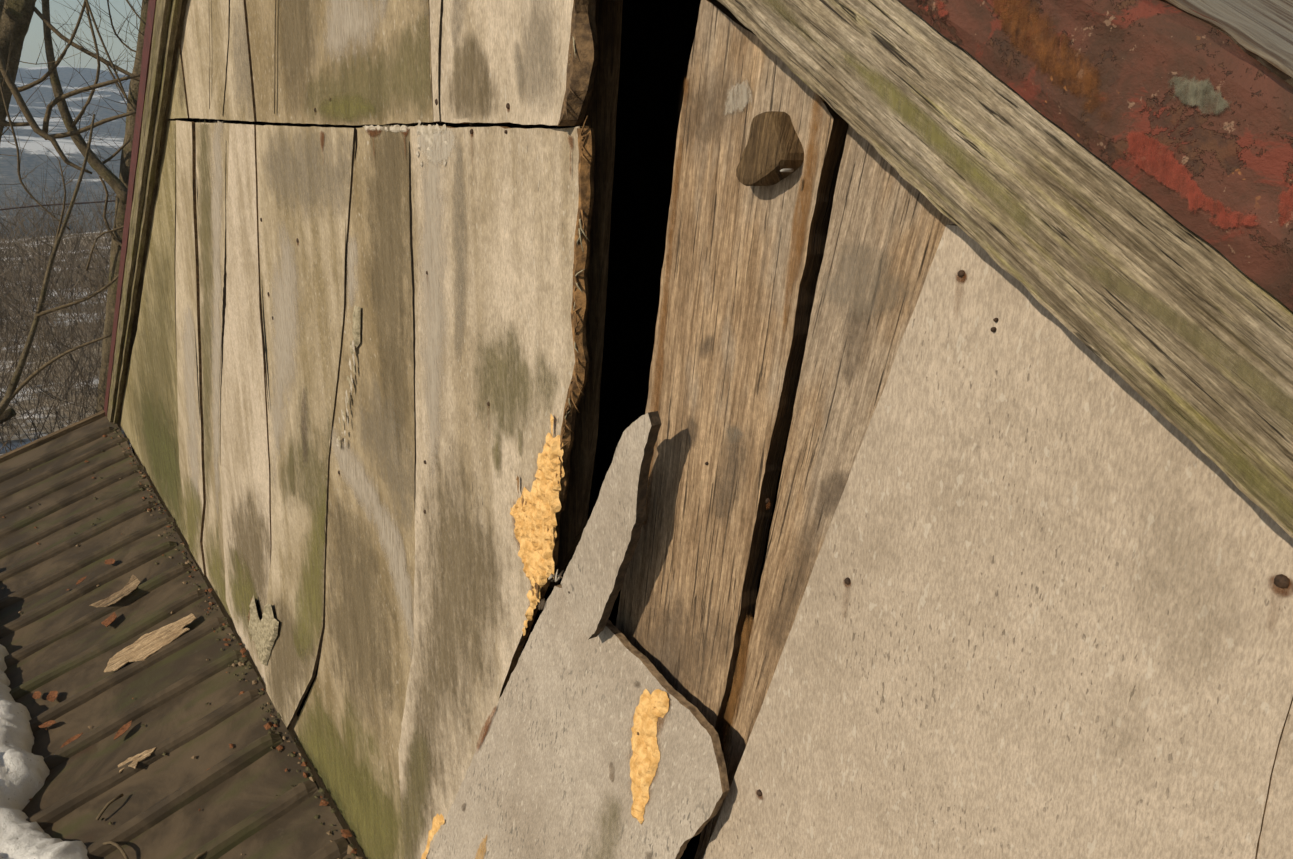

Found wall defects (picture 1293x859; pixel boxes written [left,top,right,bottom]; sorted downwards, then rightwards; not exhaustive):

water stain [449,11,492,116]
water stain [269,0,431,509]
water stain [479,334,551,470]
water stain [229,496,269,621]
water stain [283,396,391,716]
peeling [510,414,565,636]
water stain [401,465,502,858]
peeling [630,689,669,824]
peeling [421,814,445,859]